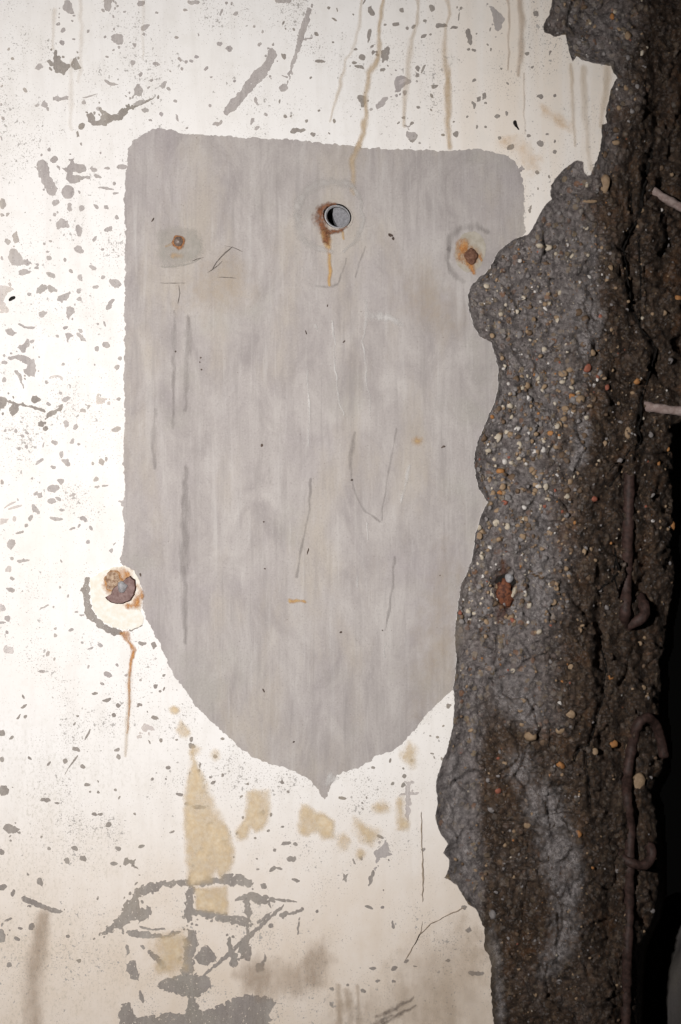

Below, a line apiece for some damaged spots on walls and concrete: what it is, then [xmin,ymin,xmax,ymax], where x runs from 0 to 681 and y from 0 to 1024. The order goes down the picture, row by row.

peeling [384,3,505,52]
water stain [350,0,384,184]
peeling [441,92,557,154]
corrosion [316,202,344,286]
corrosion [104,570,130,592]
corrosion [496,563,514,616]
corrosion [120,633,136,732]
peeling [329,959,417,1008]